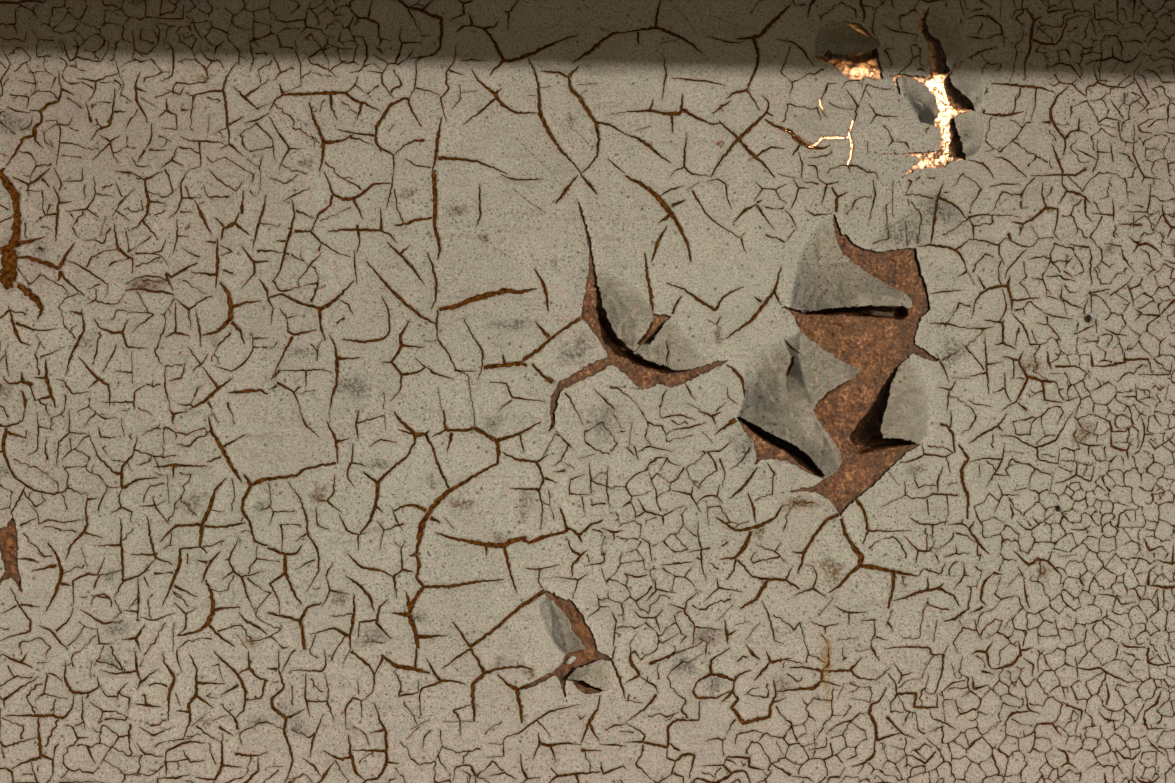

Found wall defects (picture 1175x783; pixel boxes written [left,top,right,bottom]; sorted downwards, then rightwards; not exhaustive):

peeling [811,5,985,178]
peeling [549,198,727,422]
crack [436,0,1175,783]
peeling [737,213,938,516]
peeling [525,591,616,701]